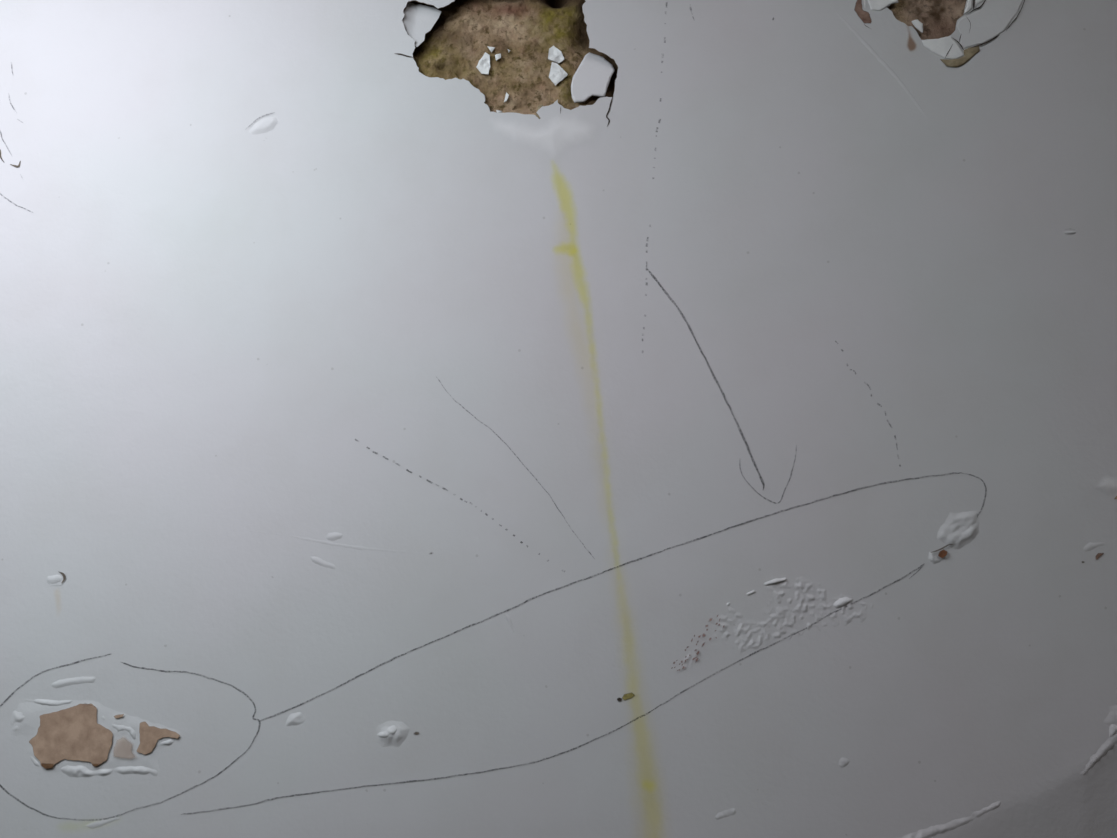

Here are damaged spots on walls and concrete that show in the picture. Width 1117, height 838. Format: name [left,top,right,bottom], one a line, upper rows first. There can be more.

spalling [394,0,618,126]
spalling [855,0,1025,67]
peeling [10,676,180,778]